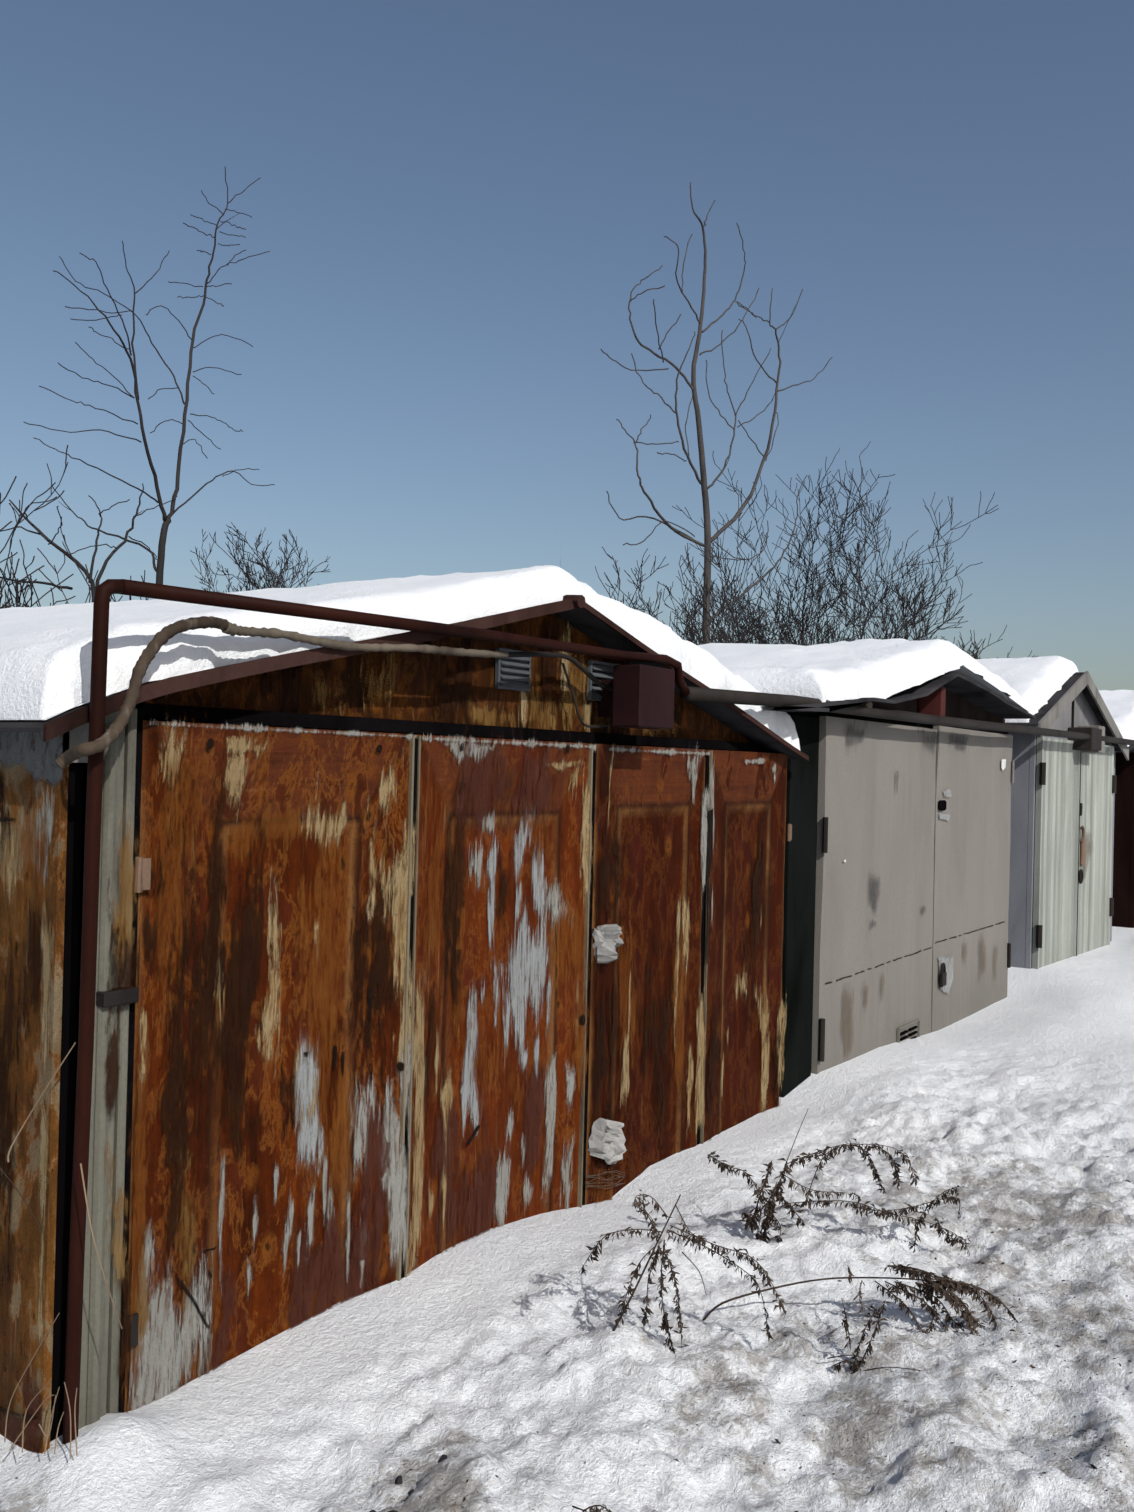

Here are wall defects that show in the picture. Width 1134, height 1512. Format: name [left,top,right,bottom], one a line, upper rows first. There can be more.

corrosion [423,615,676,1251]
corrosion [0,772,47,1280]
corrosion [105,735,395,1409]
peeling [149,721,714,1287]
corrosion [673,951,687,1092]
peeling [674,997,729,1134]
corrosion [707,1003,719,1140]
peeling [736,975,787,1112]
corrosion [768,1022,784,1108]
corrosion [0,1362,42,1454]